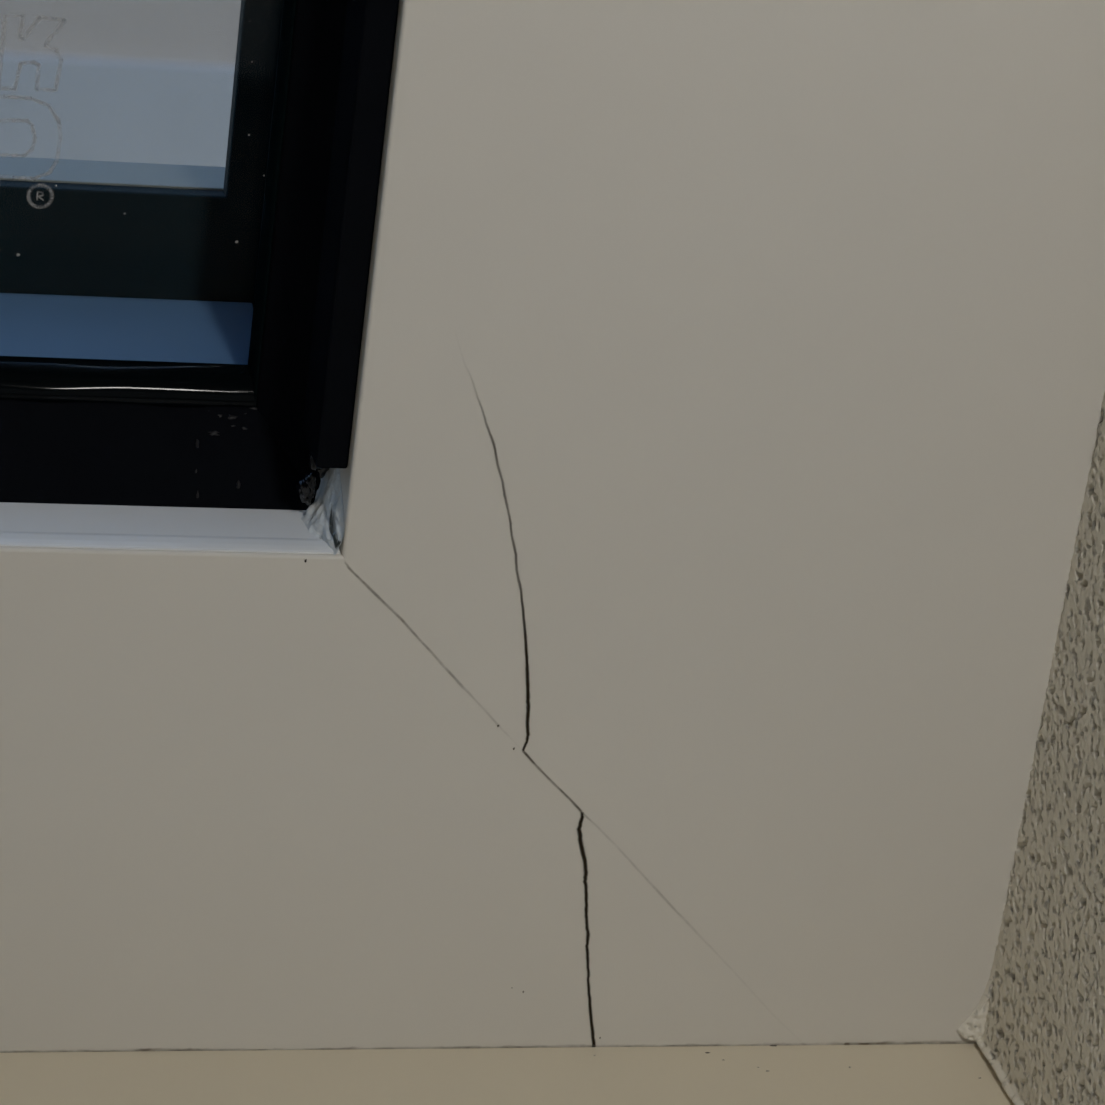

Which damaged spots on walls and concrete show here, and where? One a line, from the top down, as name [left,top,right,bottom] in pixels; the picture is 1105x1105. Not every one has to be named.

crack [503,490,595,1047]